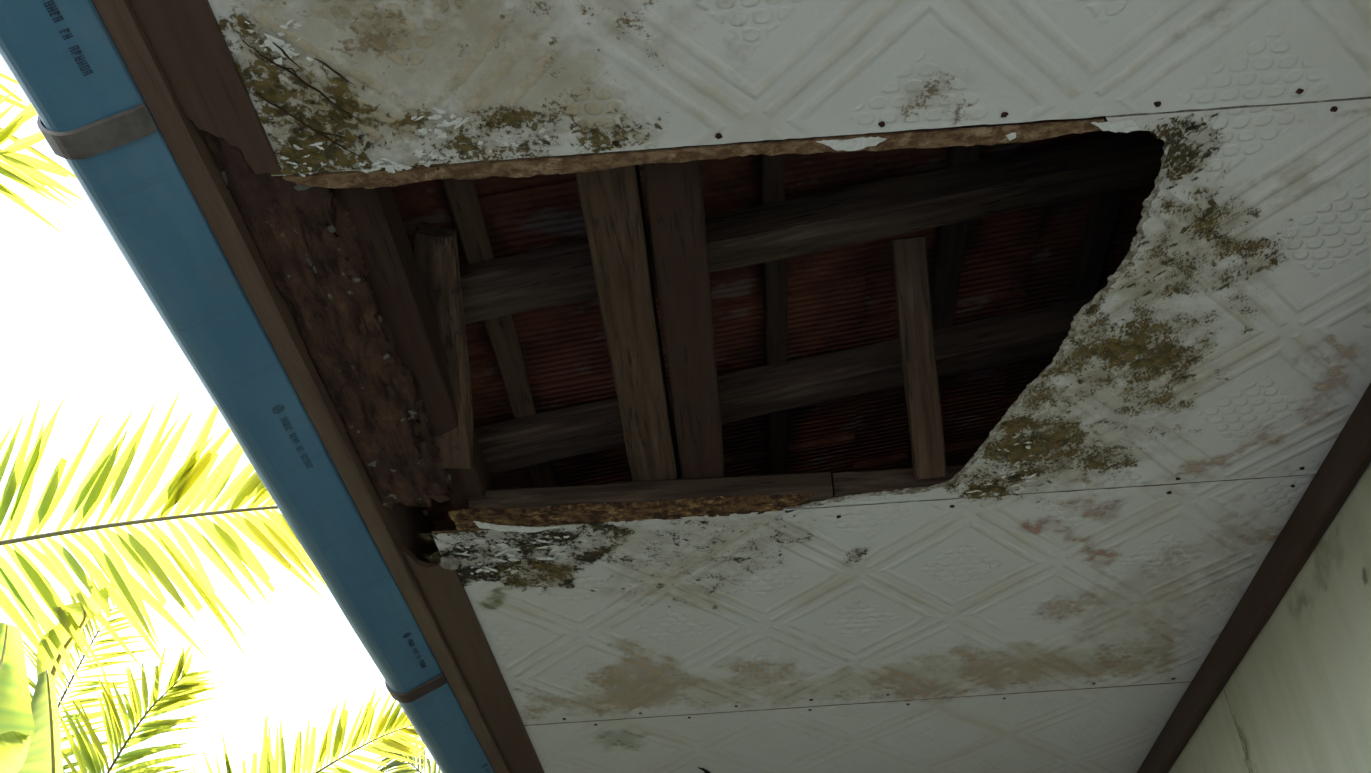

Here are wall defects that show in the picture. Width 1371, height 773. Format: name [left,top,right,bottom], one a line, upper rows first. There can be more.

leakage [219,0,671,177]
peeling [278,142,326,177]
peeling [359,107,469,173]
peeling [816,137,887,151]
peeling [1091,119,1144,133]
spalling [798,154,1169,509]
leakage [943,113,1293,503]
peeling [473,521,563,533]
leakage [420,509,816,609]